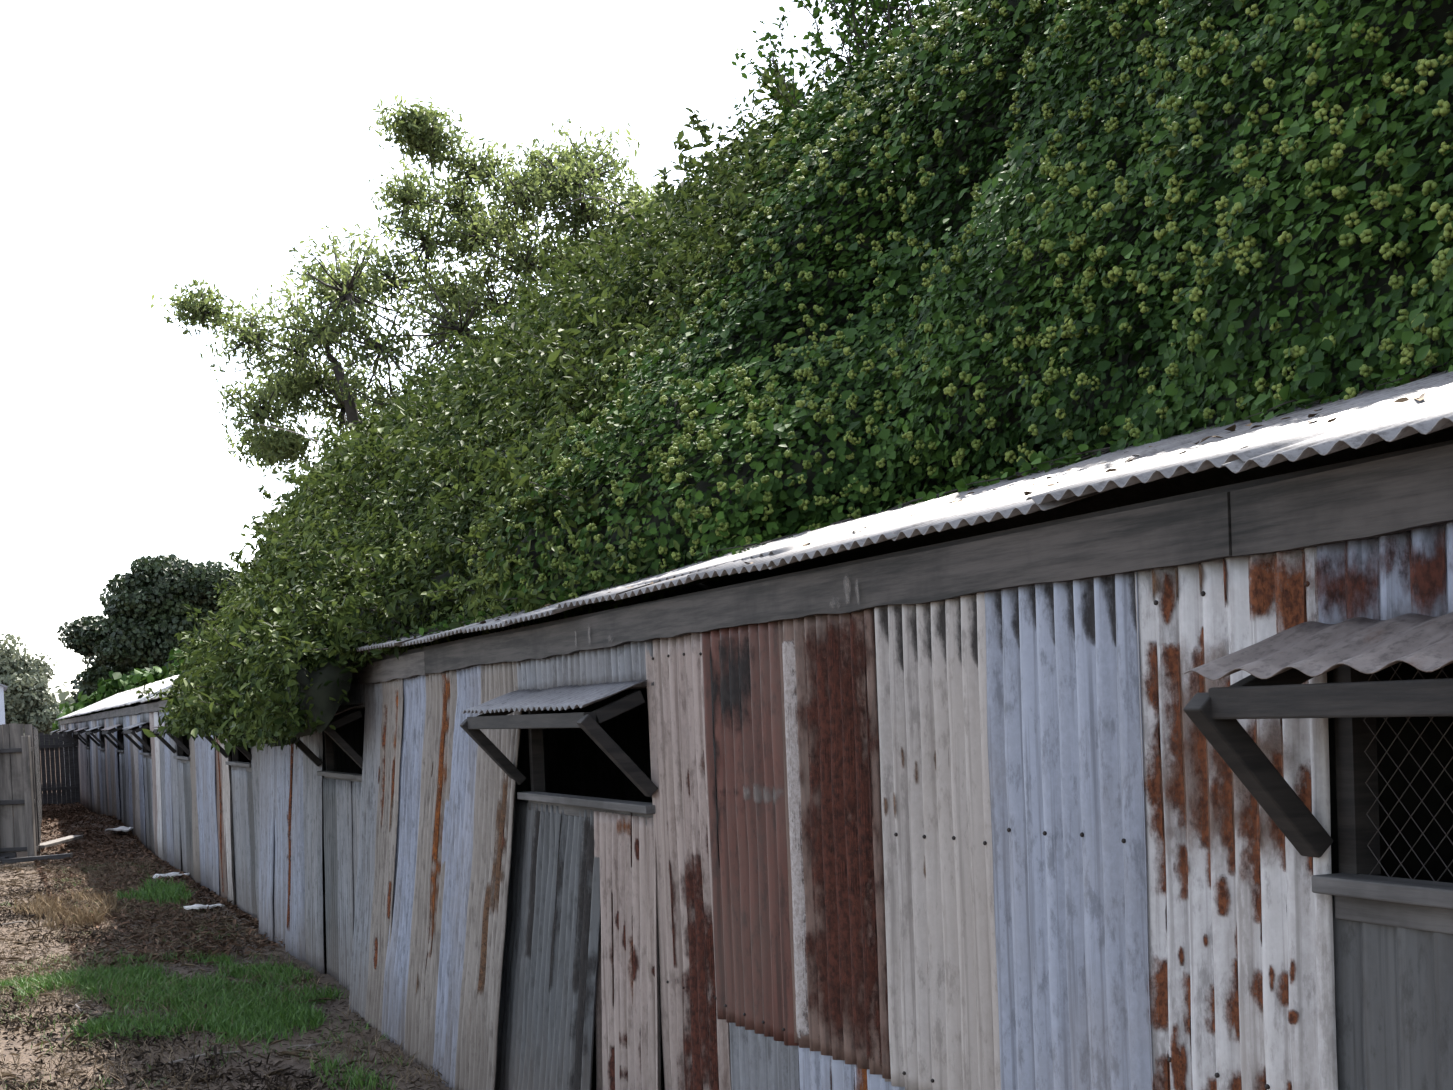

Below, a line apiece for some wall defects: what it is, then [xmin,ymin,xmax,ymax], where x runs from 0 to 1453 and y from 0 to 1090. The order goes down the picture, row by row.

corrosion [1152,571,1179,624]
corrosion [1248,530,1446,633]
corrosion [901,748,949,782]
corrosion [1248,719,1312,813]
corrosion [383,872,391,919]
corrosion [416,675,450,992]
corrosion [617,812,639,868]
corrosion [795,614,896,1090]
corrosion [1144,626,1299,1090]
corrosion [610,892,655,1008]
corrosion [669,826,719,1090]
corrosion [608,1028,641,1090]